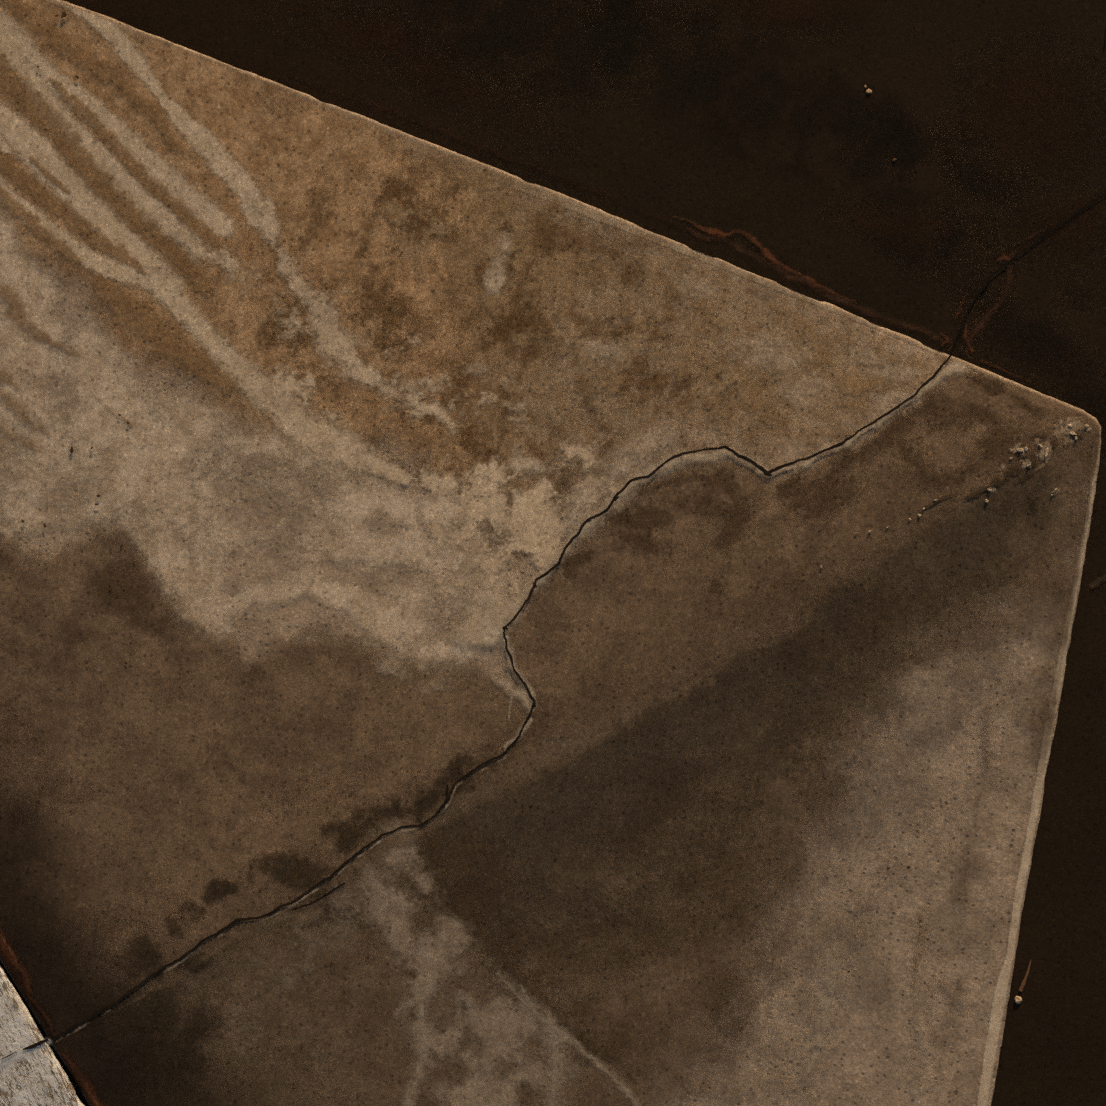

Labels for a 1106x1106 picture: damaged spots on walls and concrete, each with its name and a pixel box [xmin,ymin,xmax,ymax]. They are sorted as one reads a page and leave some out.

corrosion [673,216,948,341]
crack [2,192,1106,1059]
damp [899,658,965,740]
damp [482,1052,523,1082]